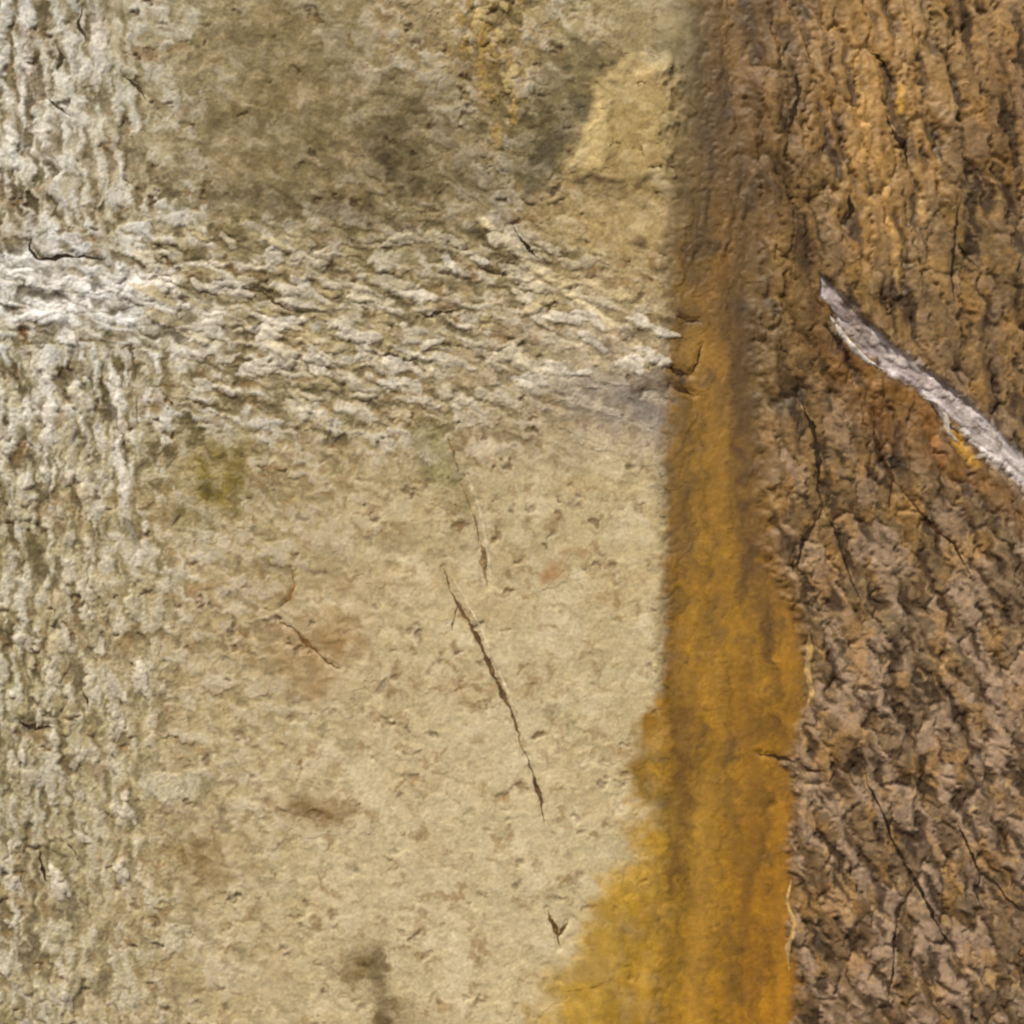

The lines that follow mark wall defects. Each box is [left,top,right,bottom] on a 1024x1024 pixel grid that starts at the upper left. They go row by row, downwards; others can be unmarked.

spalling [818,270,1024,494]
rust [506,0,971,1024]
crack [792,392,861,600]
crack [872,411,973,580]
crack [444,436,544,820]
crack [758,753,824,773]
crack [860,756,965,992]
crack [958,825,1024,912]